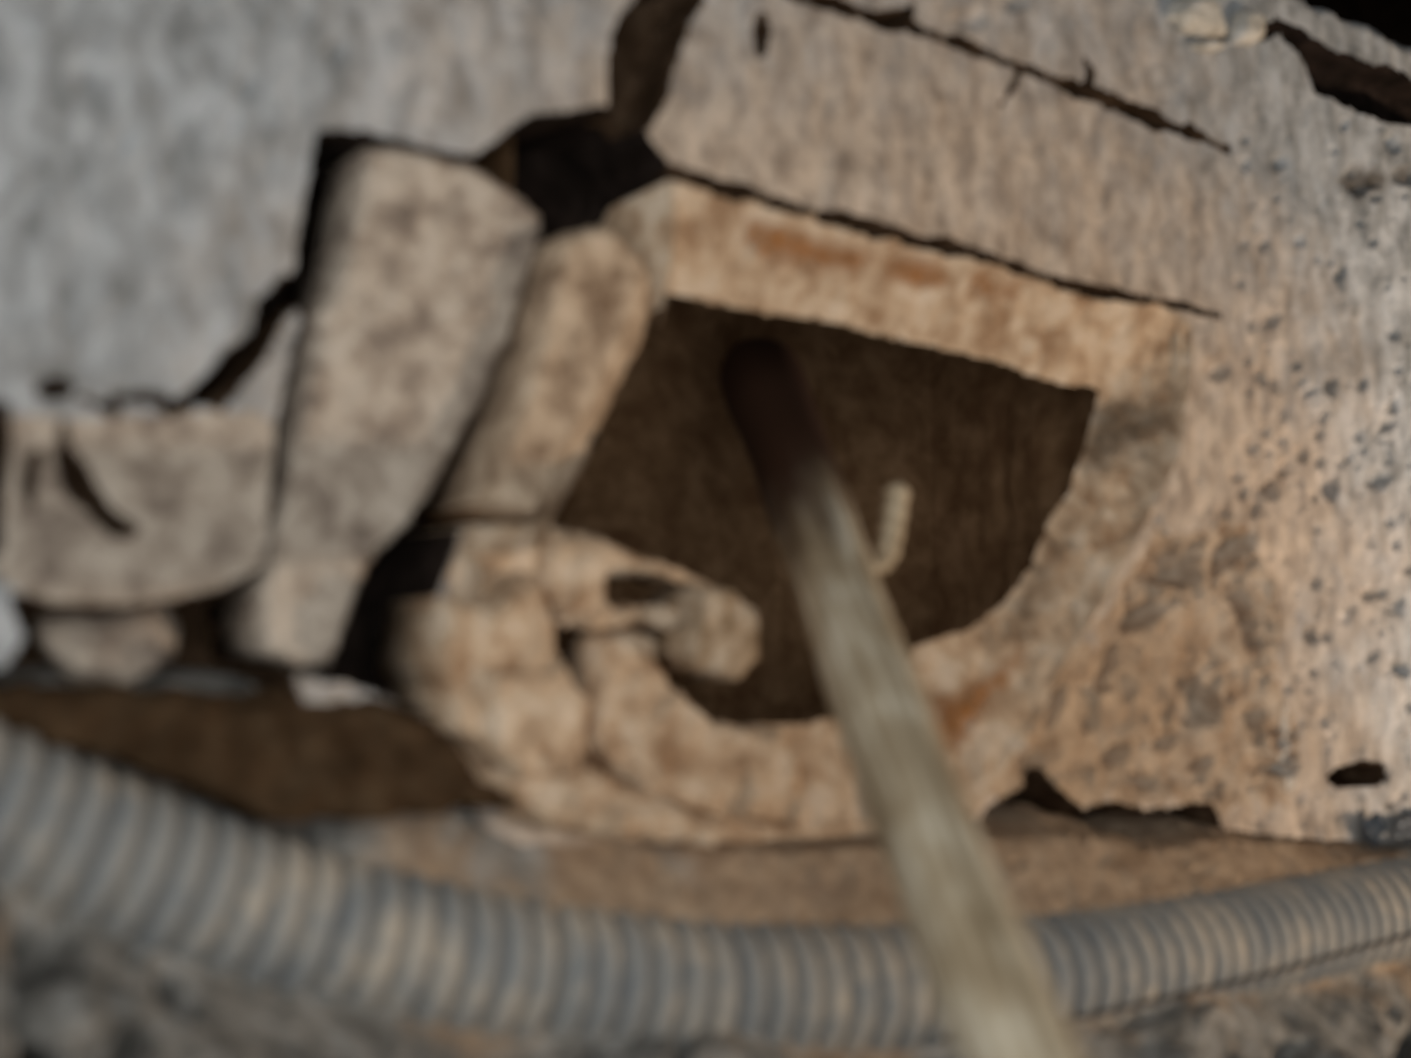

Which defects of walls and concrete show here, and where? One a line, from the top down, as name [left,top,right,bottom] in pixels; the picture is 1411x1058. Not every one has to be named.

crack [790,0,1231,155]
crack [1212,15,1411,126]
spalling [253,268,295,321]
spalling [294,104,1301,817]
spalling [689,719,876,843]